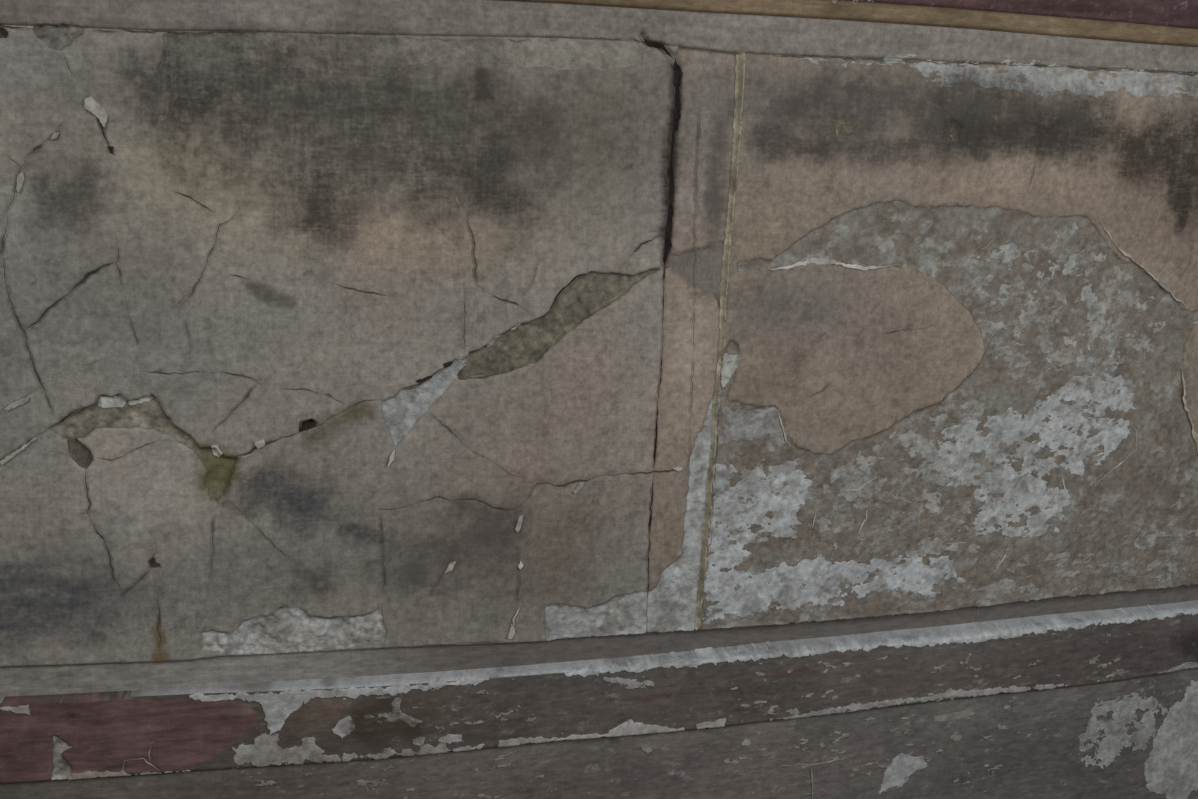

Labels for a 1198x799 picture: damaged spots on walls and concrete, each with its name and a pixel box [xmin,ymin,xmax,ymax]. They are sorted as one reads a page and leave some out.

crack [88,30,271,97]
crack [0,52,379,465]
flaking render [299,419,318,434]
flaking render [381,268,660,446]
crack [378,36,724,646]
flaking render [545,52,1198,641]
flaking render [52,735,191,780]
crack [82,440,163,651]
crack [211,499,287,582]
flaking render [202,606,387,655]
peeling [189,672,726,799]
peeling [564,602,1198,799]